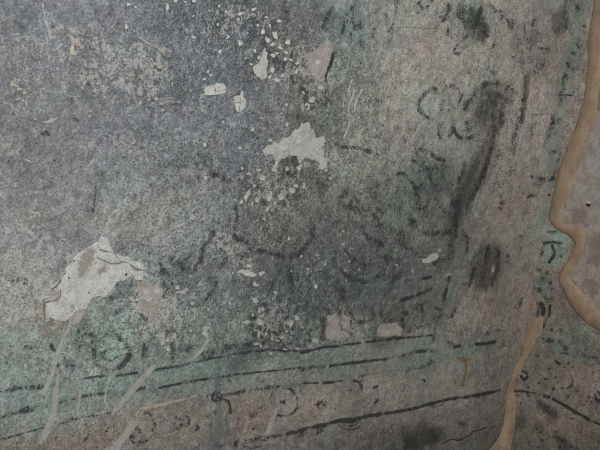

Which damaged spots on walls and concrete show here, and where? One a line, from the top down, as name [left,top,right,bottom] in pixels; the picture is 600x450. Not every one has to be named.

spalling [245,16,334,90]
spalling [202,69,226,105]
spalling [233,91,246,112]
spalling [263,122,332,180]
peeling [240,166,306,220]
spalling [43,236,189,351]
spalling [307,313,364,349]
spalling [377,322,403,337]